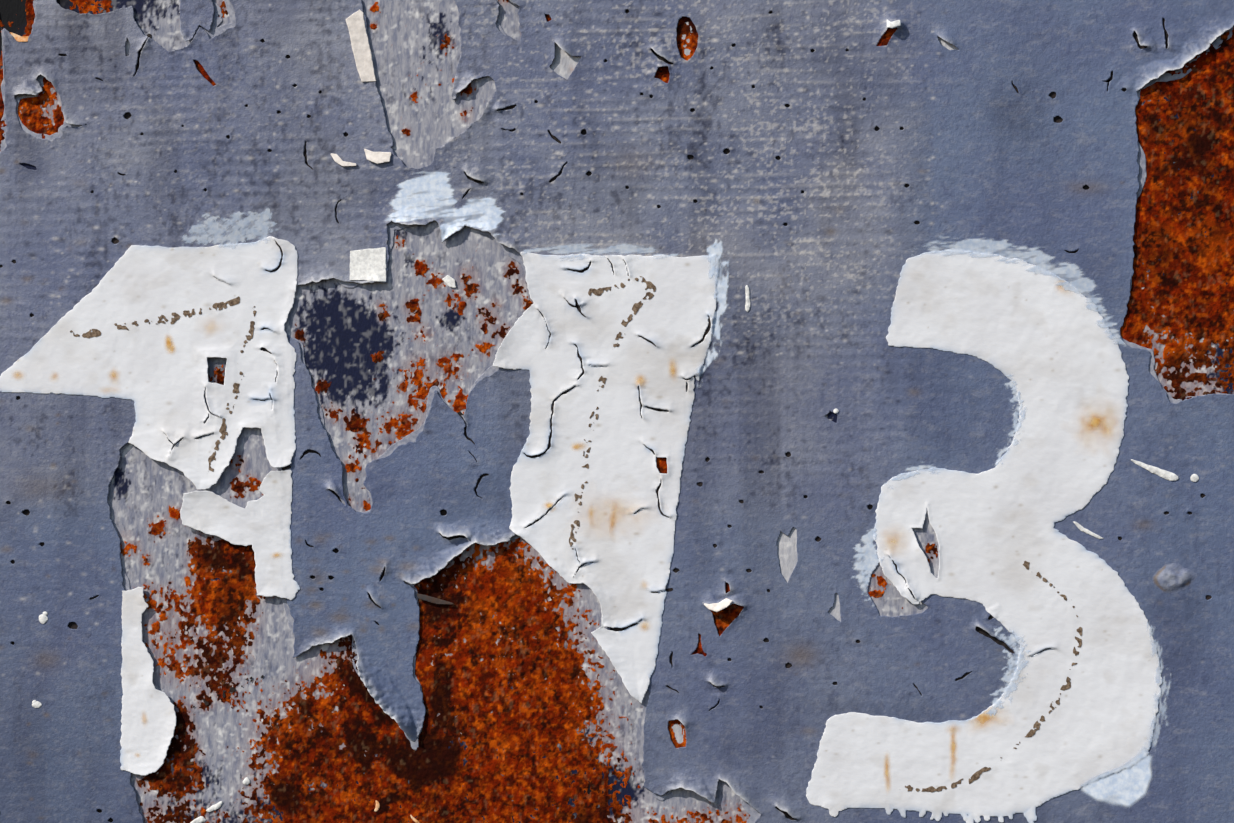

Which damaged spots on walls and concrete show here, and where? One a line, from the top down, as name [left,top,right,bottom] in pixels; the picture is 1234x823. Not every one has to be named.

peeling [331,0,496,169]
crack [265,241,283,272]
peeling [1120,26,1234,404]
peeling [168,357,227,449]
crack [253,328,278,405]
peeling [285,221,534,513]
crack [524,259,629,458]
crack [634,315,711,518]
peeling [108,427,761,823]
crack [525,496,564,528]
peeling [868,563,928,617]
peeling [912,511,939,578]